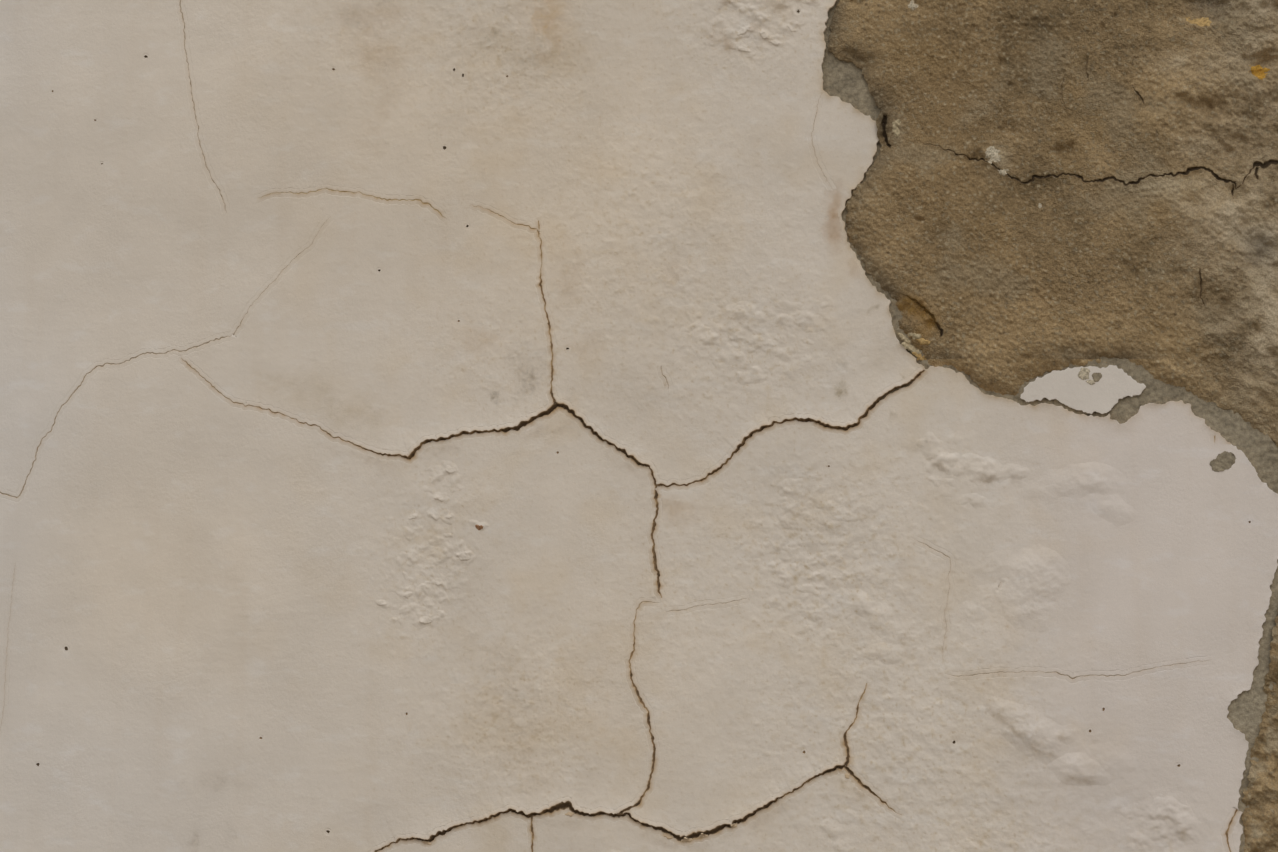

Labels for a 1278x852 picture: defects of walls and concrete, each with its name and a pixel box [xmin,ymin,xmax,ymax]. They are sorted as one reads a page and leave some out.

crack [0,0,928,852]
crack [899,290,948,340]
spalling [828,0,1278,447]
crack [876,111,1278,199]
peeling [1210,451,1236,472]
spalling [1242,610,1278,852]